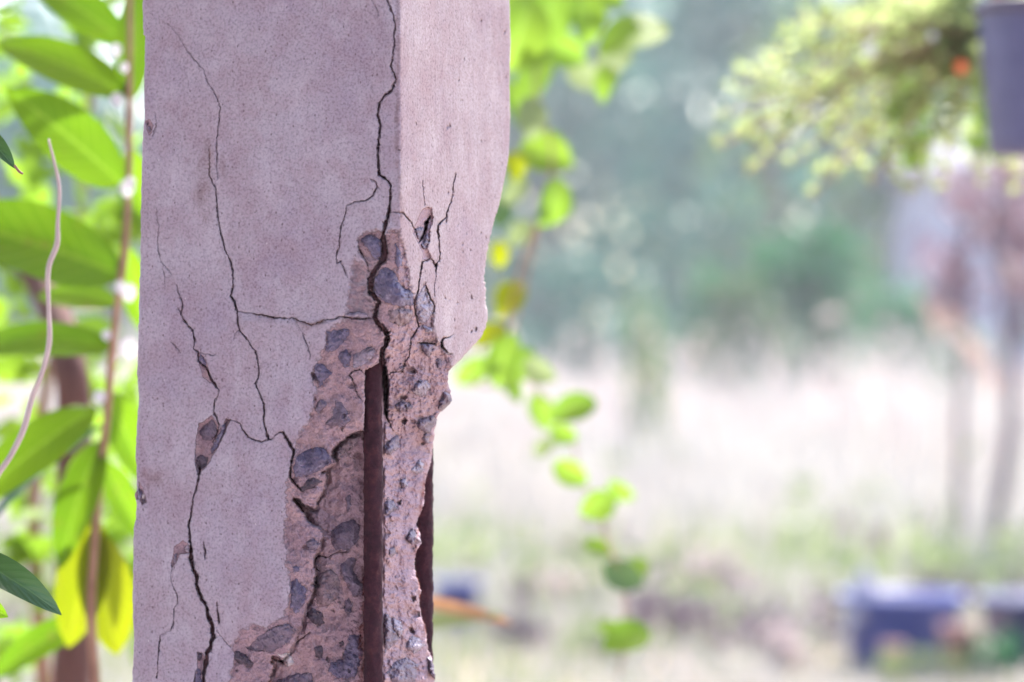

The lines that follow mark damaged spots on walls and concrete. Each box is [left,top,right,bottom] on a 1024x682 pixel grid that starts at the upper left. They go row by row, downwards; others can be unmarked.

crack [188,467,219,682]
crack [216,196,363,512]
spalling [229,230,452,682]
crack [266,0,448,422]
spalling [413,207,433,260]